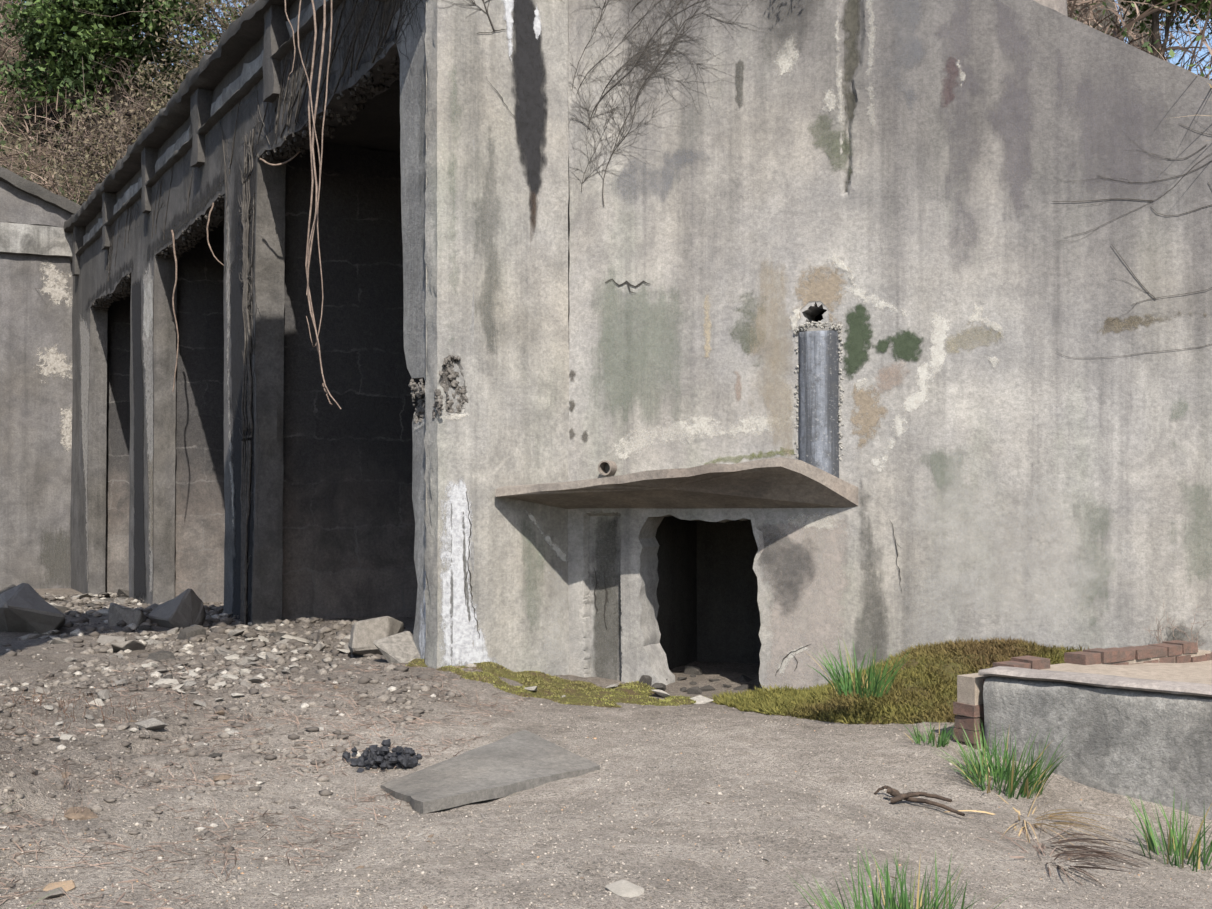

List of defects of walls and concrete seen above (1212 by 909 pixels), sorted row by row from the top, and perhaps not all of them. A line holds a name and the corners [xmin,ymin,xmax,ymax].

water stain [503,0,547,225]
water stain [813,116,850,171]
spalling [791,255,855,329]
peeling [37,180,234,592]
spalling [408,355,468,431]